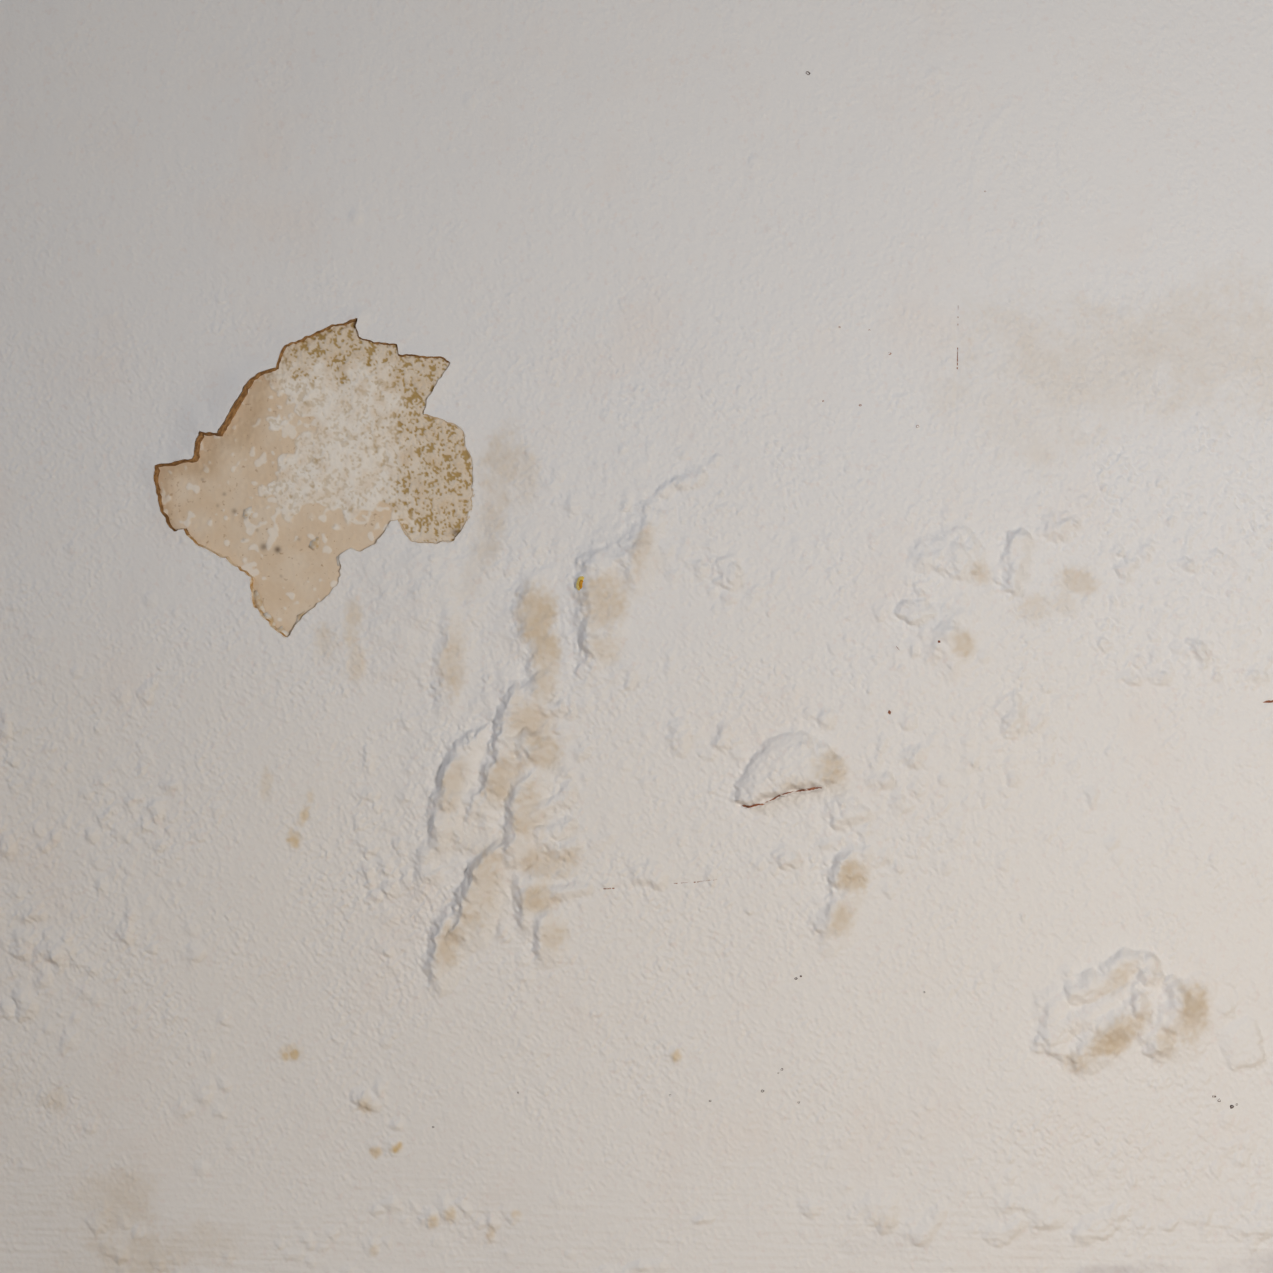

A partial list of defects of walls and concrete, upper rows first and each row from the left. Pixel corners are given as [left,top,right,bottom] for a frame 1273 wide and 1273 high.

peeling [134,304,474,638]